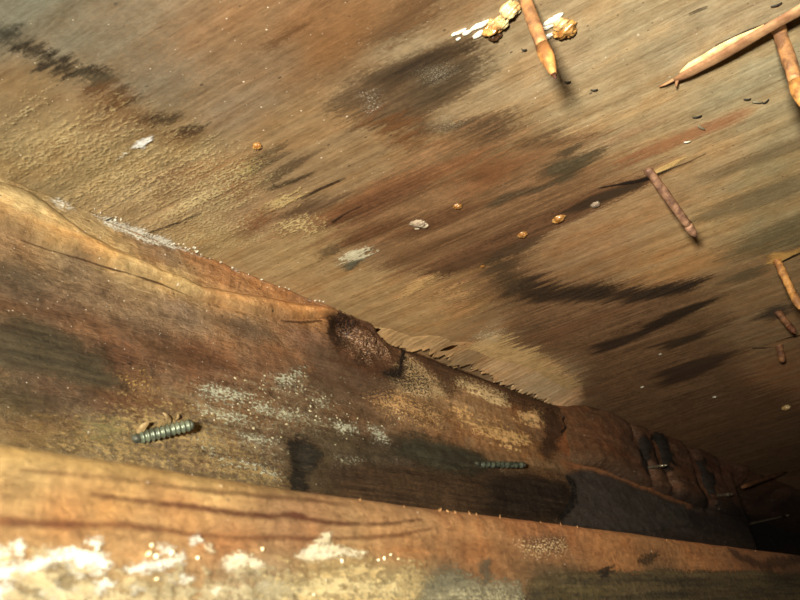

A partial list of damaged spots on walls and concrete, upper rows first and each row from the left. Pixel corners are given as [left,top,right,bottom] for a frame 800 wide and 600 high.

crack [66,255,172,289]
water stain [0,26,800,476]
water stain [0,313,690,534]
water stain [0,531,800,600]